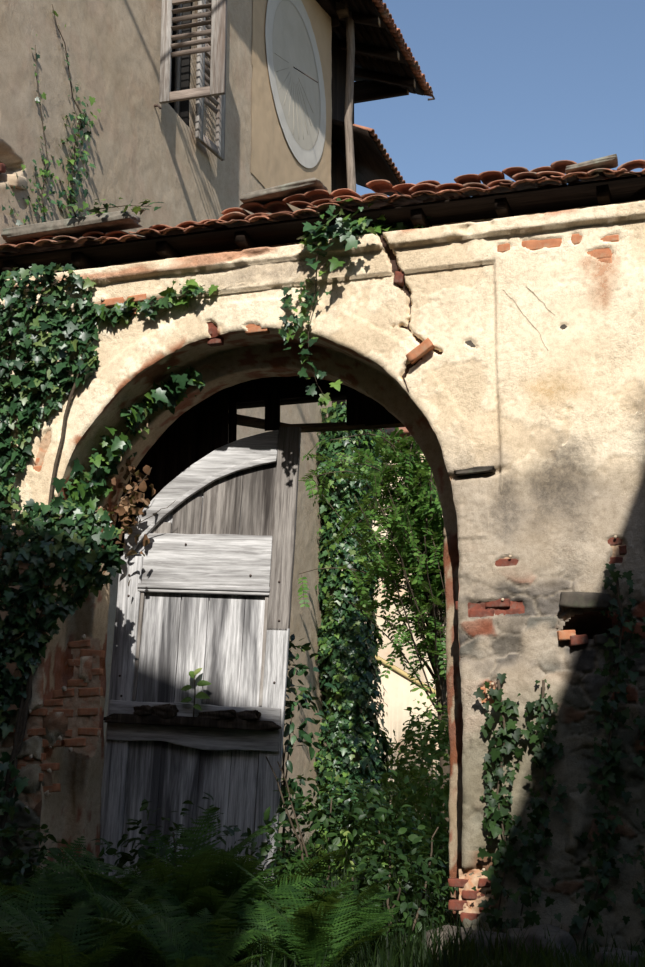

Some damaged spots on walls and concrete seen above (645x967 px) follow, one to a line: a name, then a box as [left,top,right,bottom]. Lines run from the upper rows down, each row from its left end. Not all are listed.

spalling [0,161,28,190]
spalling [522,234,582,250]
spalling [587,235,619,263]
crack [380,235,443,392]
spalling [495,555,519,567]
spalling [608,535,627,564]
spalling [455,598,525,618]
spalling [556,592,614,647]
peeling [0,634,105,809]
spalling [448,868,493,923]